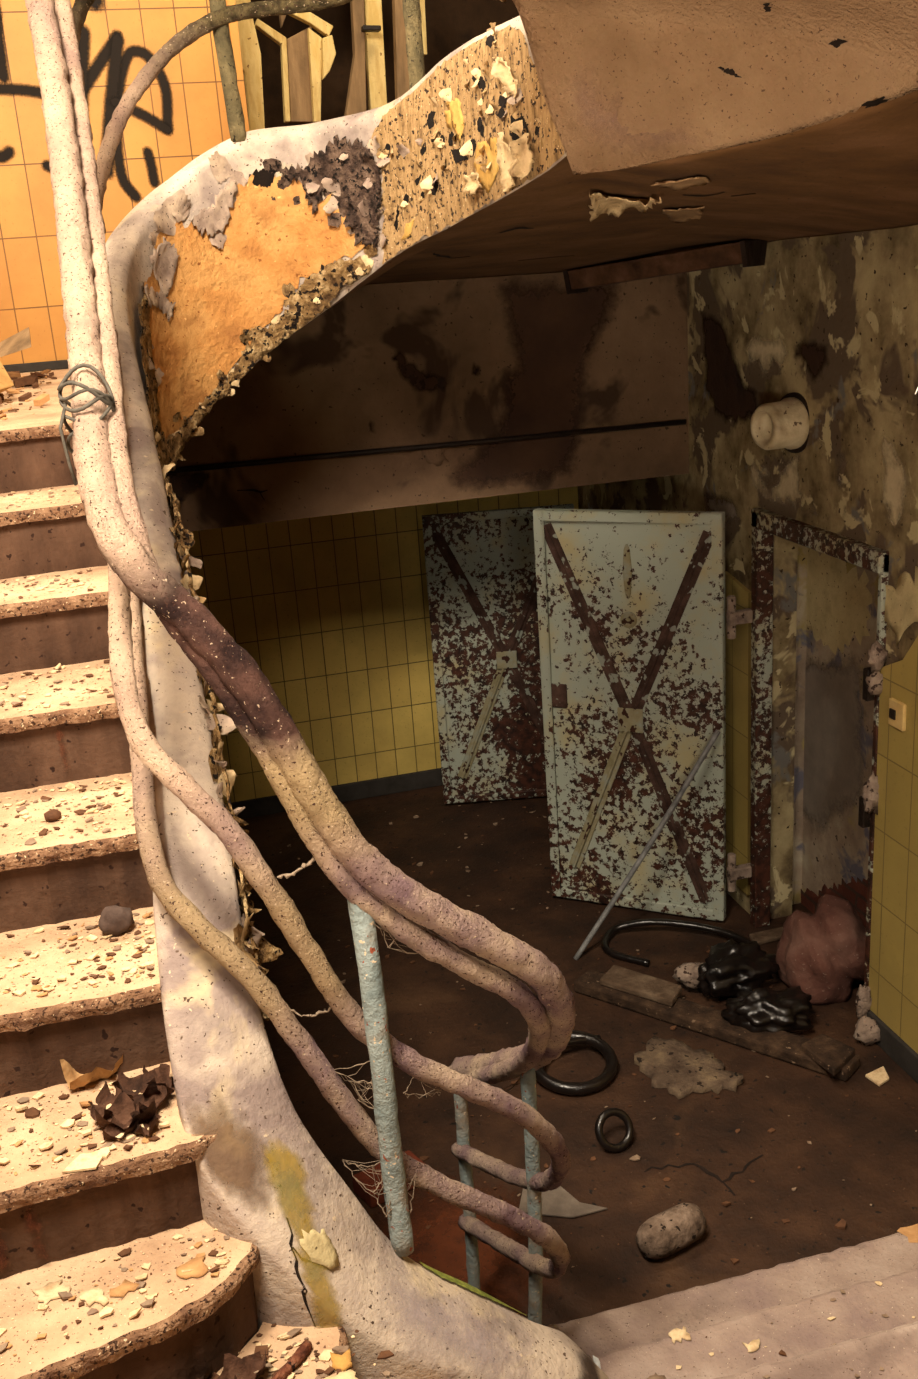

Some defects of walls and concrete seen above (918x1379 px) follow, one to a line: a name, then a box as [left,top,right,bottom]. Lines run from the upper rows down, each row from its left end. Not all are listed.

spalling [861,96,889,108]
flaking render [588,177,711,223]
peeling [138,134,386,603]
water stain [455,281,617,489]
water stain [701,313,827,423]
water stain [707,496,737,520]
water stain [751,459,801,502]
water stain [882,439,905,524]
peeling [197,669,249,834]
peeling [231,858,283,975]
water stain [193,1106,338,1328]
crack [286,1217,316,1327]